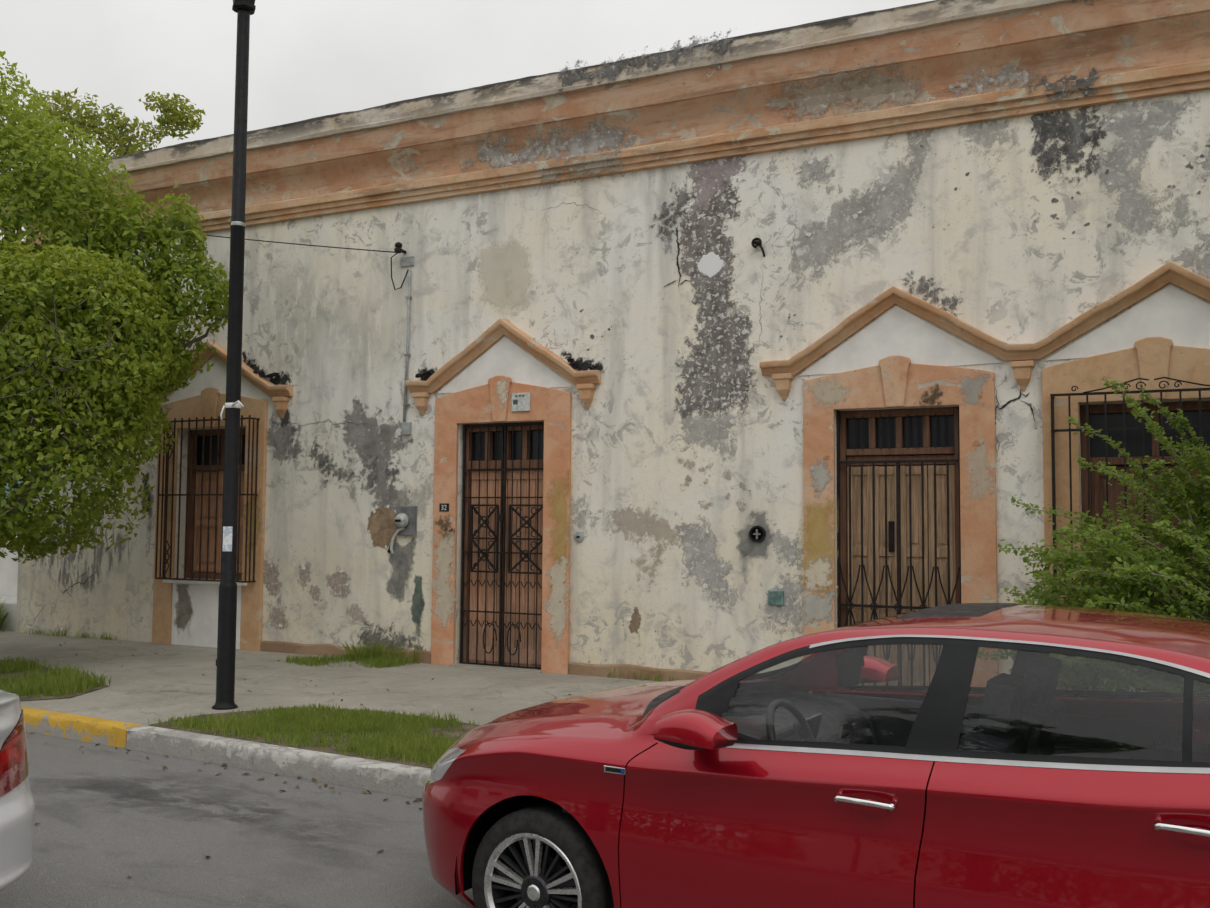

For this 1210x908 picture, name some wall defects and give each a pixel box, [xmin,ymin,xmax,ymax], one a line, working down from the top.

spalling [765,57,931,127]
spalling [949,63,1038,97]
peeling [779,129,936,283]
peeling [1095,98,1210,279]
spalling [673,155,757,512]
crack [995,373,1036,467]
peeling [607,501,737,611]
peeling [759,455,838,642]